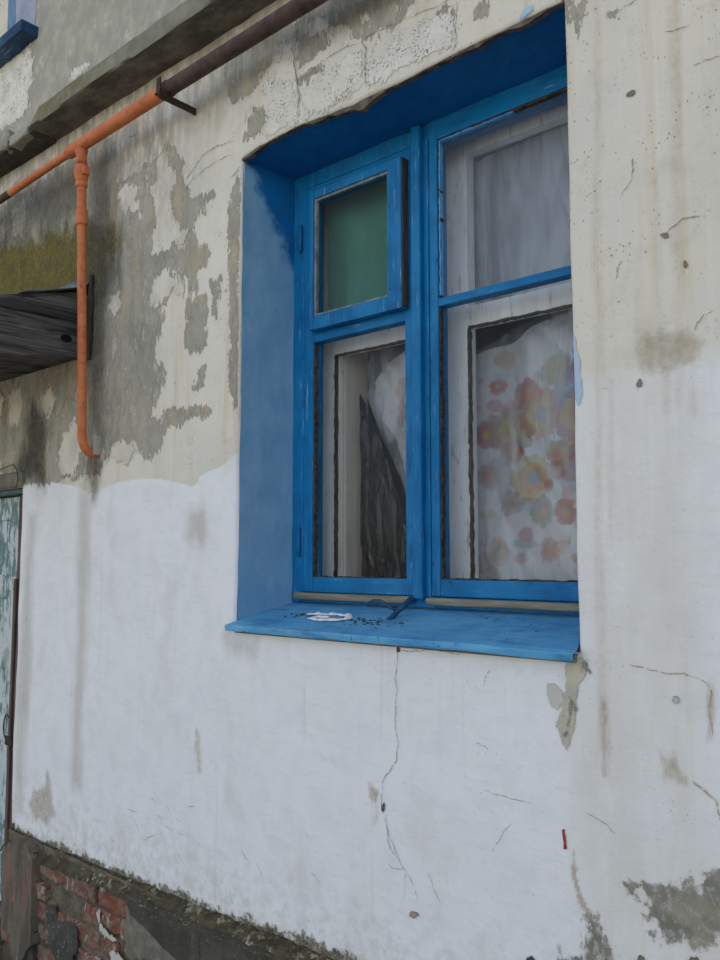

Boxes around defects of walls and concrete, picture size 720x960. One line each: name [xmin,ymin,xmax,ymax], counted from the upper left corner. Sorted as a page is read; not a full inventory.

peeling [0,43,35,130]
peeling [68,62,90,82]
peeling [223,0,589,162]
peeling [0,137,241,488]
damp [19,410,44,482]
peeling [546,656,591,750]
crack [381,650,458,895]
damp [572,866,591,917]
flaking render [623,869,720,960]